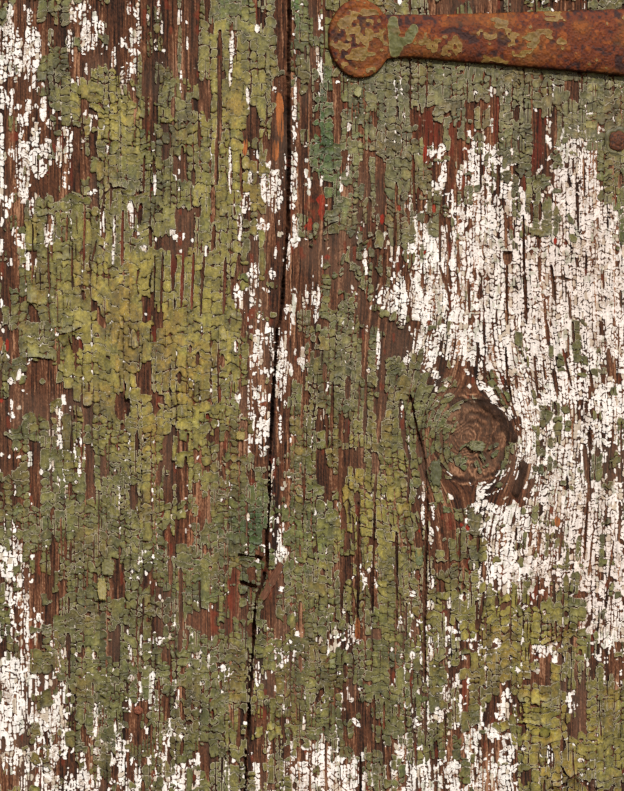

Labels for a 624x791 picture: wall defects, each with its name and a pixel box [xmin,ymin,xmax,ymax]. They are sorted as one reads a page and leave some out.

peeling [0,0,101,351]
peeling [178,205,202,250]
crack [308,221,340,243]
peeling [15,352,66,421]
crack [238,0,293,791]
peeling [236,0,624,667]
peeling [97,551,127,602]
peeling [159,427,248,657]
peeling [0,526,119,791]
peeling [126,688,239,791]
crack [310,686,325,706]
peeling [261,682,531,791]